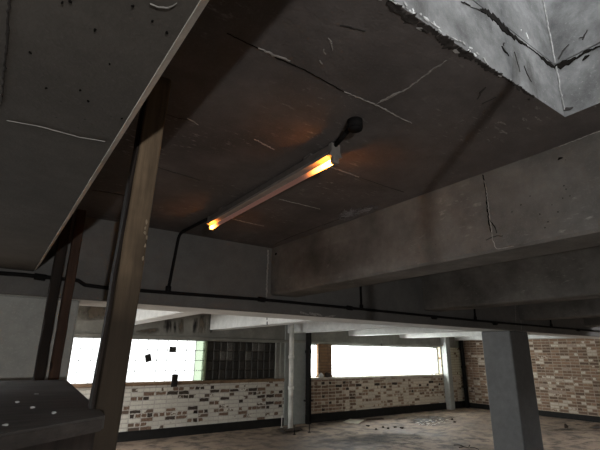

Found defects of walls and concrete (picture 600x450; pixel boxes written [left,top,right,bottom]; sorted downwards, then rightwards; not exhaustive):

crack [150,2,177,10]
crack [227,33,447,124]
spalling [379,0,535,100]
crack [461,0,600,111]
crack [7,120,105,142]
crack [482,175,512,249]